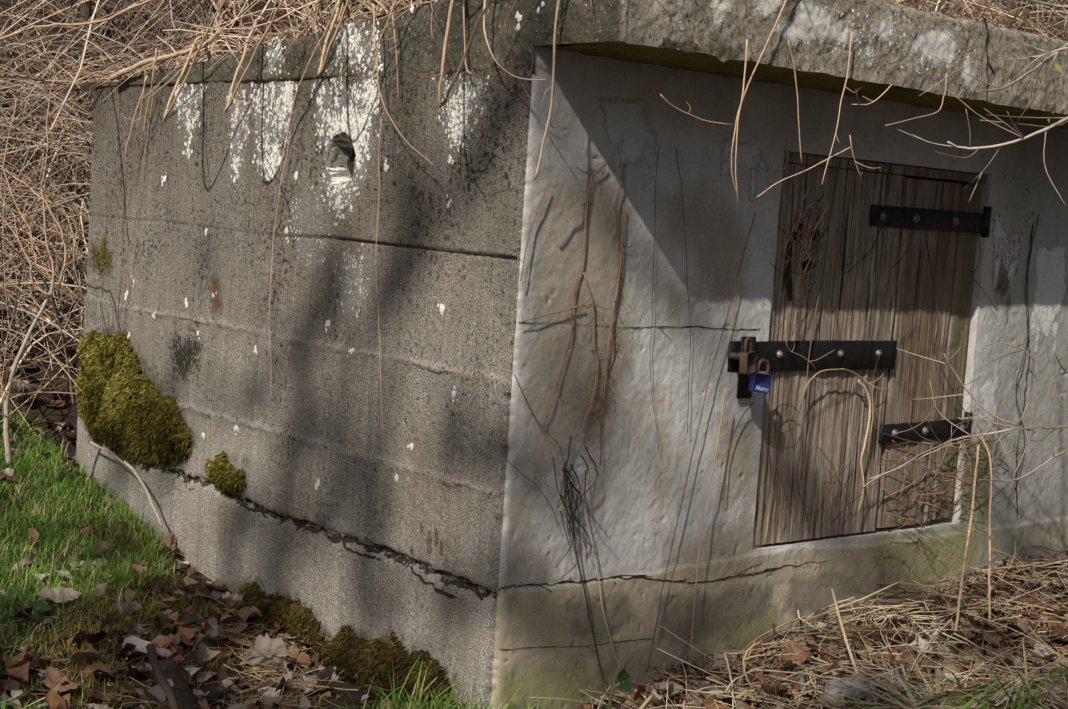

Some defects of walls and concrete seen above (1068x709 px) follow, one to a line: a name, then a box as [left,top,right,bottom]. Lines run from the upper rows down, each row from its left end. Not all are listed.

damp [174,83,207,163]
damp [225,36,298,192]
damp [169,323,207,392]
crack [154,465,828,601]